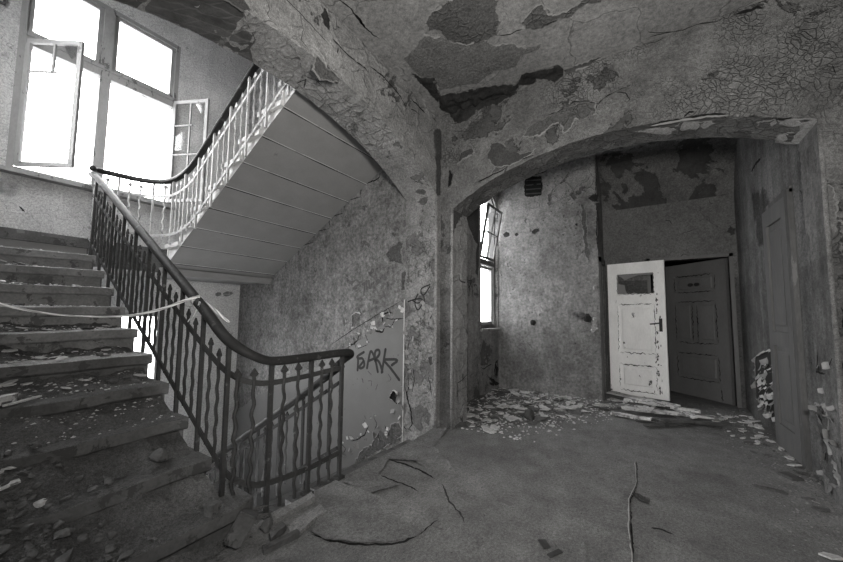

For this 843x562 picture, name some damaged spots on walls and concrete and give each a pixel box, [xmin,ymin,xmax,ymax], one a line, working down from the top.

flaking render [113,0,256,62]
crack [287,0,425,115]
crack [647,5,763,44]
peeling [349,305,404,347]
peeling [342,380,412,462]
peeling [751,349,775,422]
peeling [808,388,841,493]